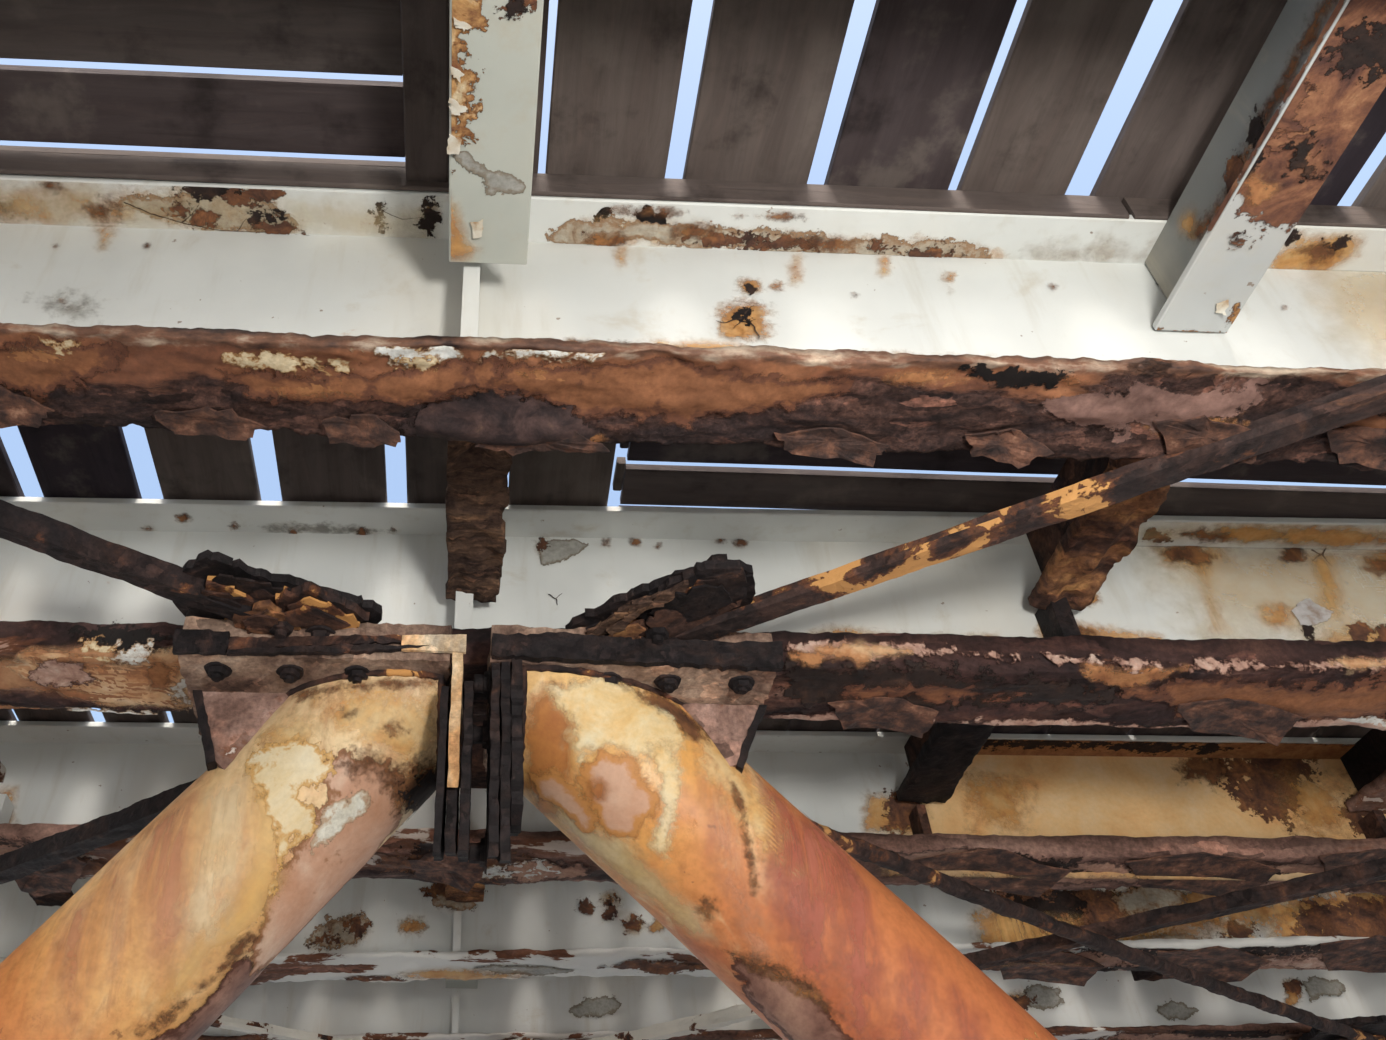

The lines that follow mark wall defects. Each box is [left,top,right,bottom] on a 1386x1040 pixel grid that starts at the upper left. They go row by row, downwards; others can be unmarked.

peeling [447,0,526,196]
corrosion [1182,0,1386,271]
corrosion [1142,526,1386,576]
corrosion [1119,621,1386,721]
corrosion [864,739,1386,839]
peeling [242,732,403,977]
peeling [569,994,622,1018]
peeling [1010,984,1065,1011]
corrosion [935,870,1239,943]
peeling [1120,917,1272,983]
corrosion [1022,880,1386,1005]
peeling [1302,934,1386,1003]